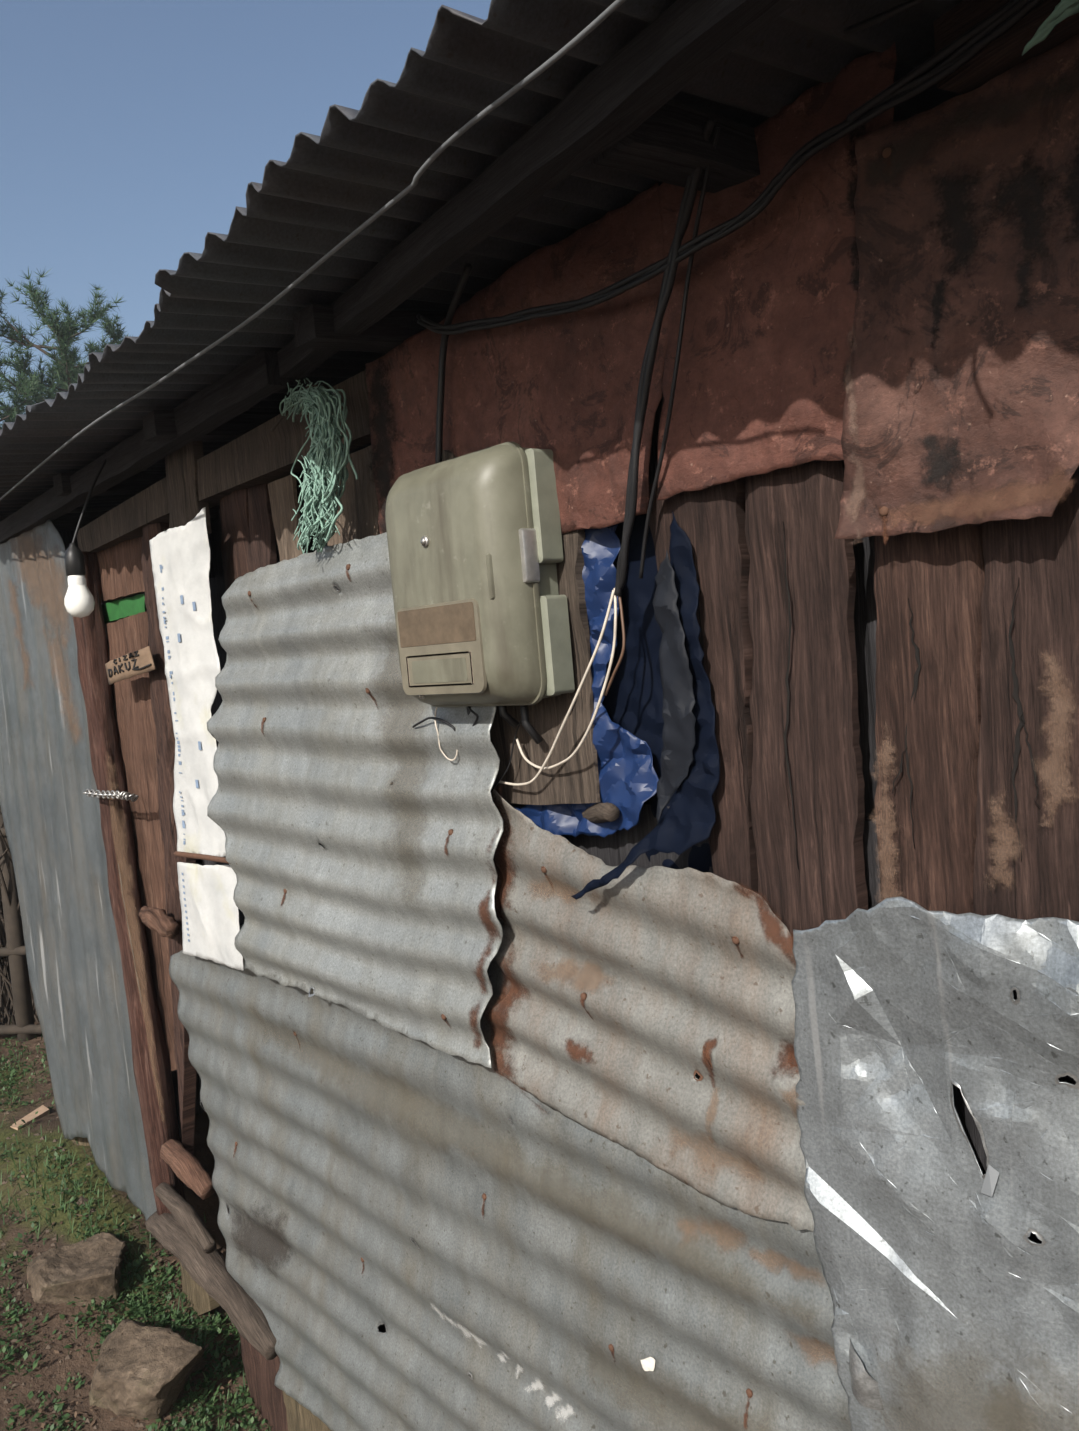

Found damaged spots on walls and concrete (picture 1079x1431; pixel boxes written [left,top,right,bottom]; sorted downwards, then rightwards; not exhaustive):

peeling [1040,654,1075,824]
peeling [873,741,899,899]
peeling [992,801,1017,886]
rust [470,790,544,1111]
rust [566,1039,592,1063]
rust [702,1039,717,1087]
peeling [981,1164,999,1197]